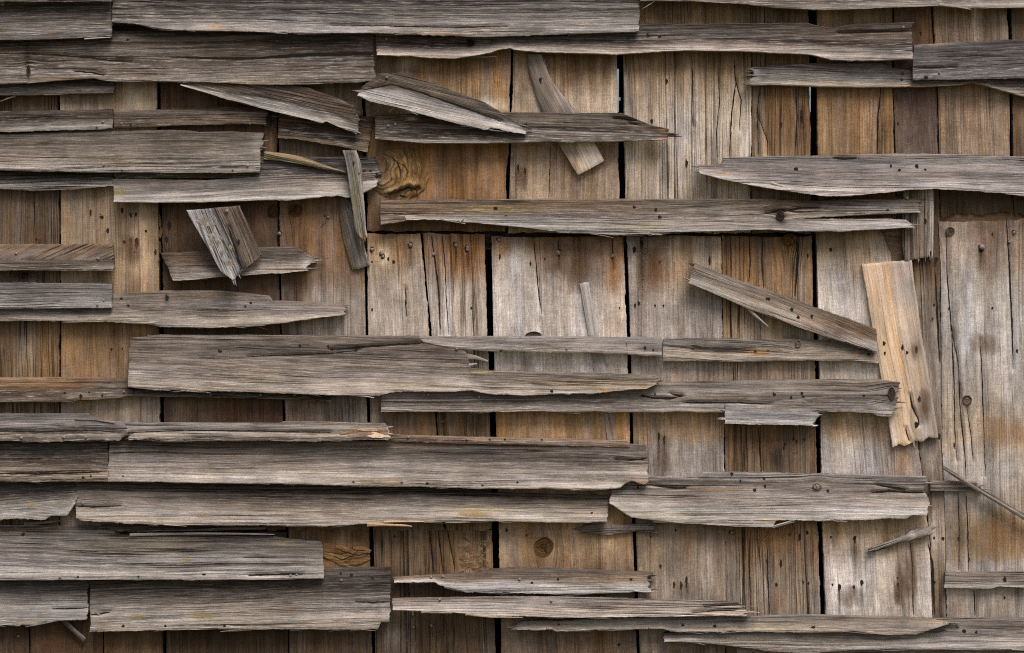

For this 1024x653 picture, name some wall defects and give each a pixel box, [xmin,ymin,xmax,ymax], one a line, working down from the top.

crack [692,64,768,157]
crack [935,235,986,476]
crack [1006,218,1014,357]